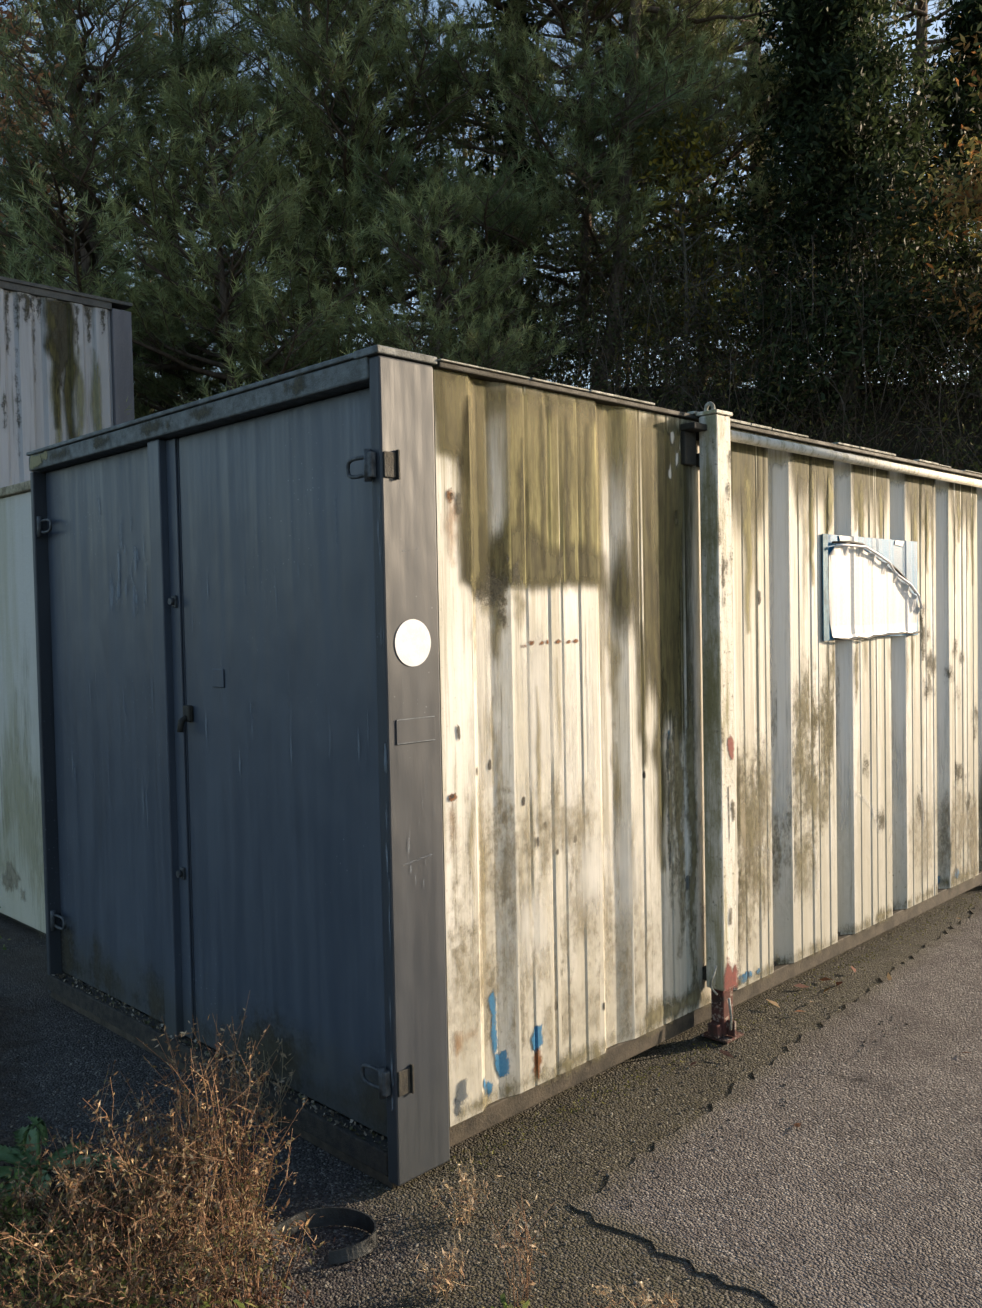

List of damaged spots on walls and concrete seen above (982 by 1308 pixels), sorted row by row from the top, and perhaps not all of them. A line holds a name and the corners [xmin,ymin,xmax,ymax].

water stain [4,292,109,460]
water stain [459,401,546,649]
water stain [791,442,834,582]
water stain [851,452,976,584]
water stain [609,633,620,696]
water stain [470,714,590,925]
water stain [638,631,698,985]
water stain [721,641,838,952]
peeling [454,1078,468,1116]
peeling [483,990,510,1097]
peeling [531,1025,543,1081]
corrosion [724,958,738,992]